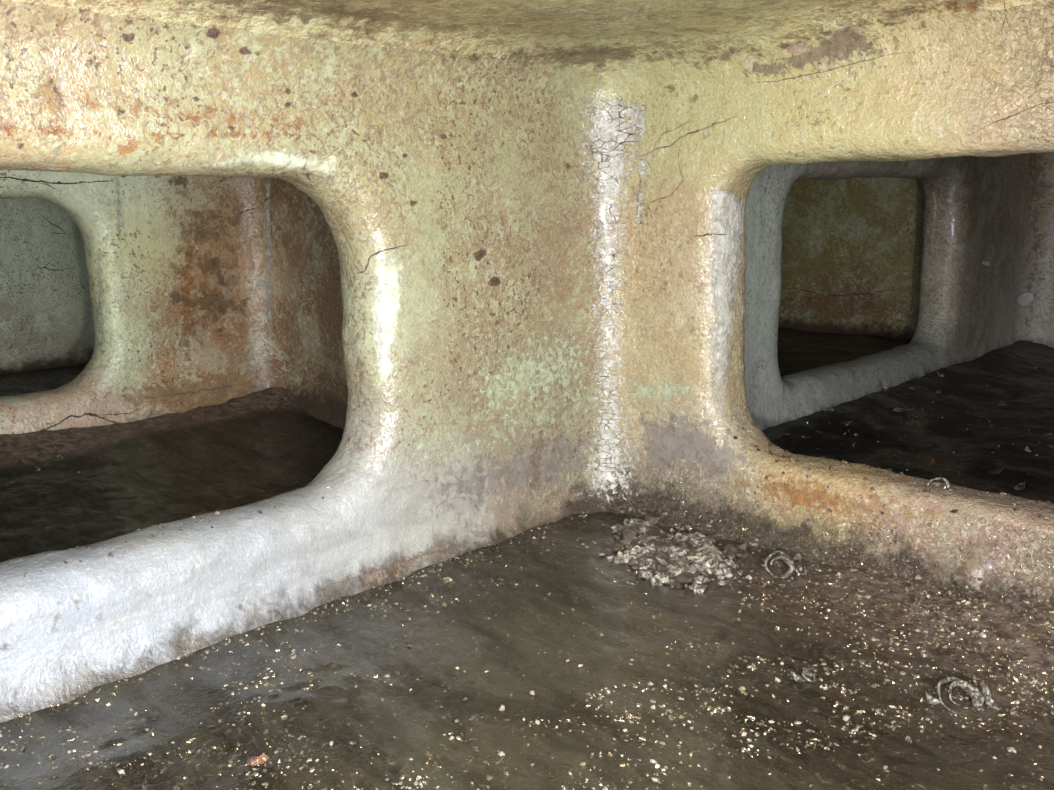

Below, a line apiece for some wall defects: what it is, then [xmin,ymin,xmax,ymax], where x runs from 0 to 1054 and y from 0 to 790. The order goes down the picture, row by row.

crack [584,101,736,204]
crack [0,176,125,190]
rust [171,206,245,348]
crack [37,383,245,432]
rust [735,474,939,526]